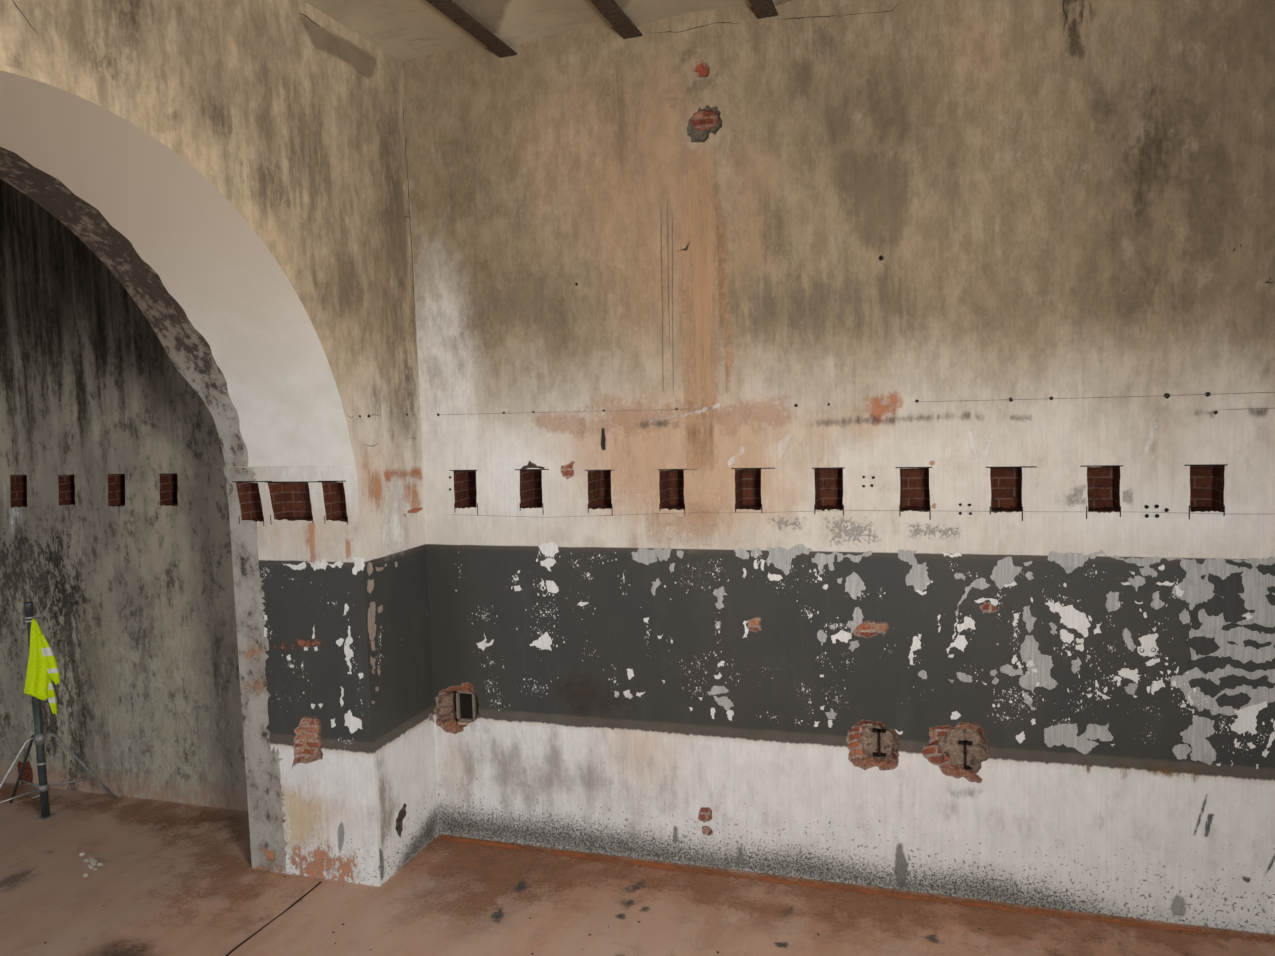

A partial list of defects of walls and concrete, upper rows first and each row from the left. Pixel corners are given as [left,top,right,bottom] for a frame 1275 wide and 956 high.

water stain [302,18,375,76]
water stain [454,0,509,32]
crack [781,5,897,20]
rust [872,395,898,422]
water stain [0,508,94,790]
spalling [276,557,398,768]
peeling [509,542,889,728]
peeling [937,549,1275,769]
spalling [846,719,903,771]
spalling [922,711,990,783]
water stain [379,779,1188,924]
water stain [1194,796,1214,837]